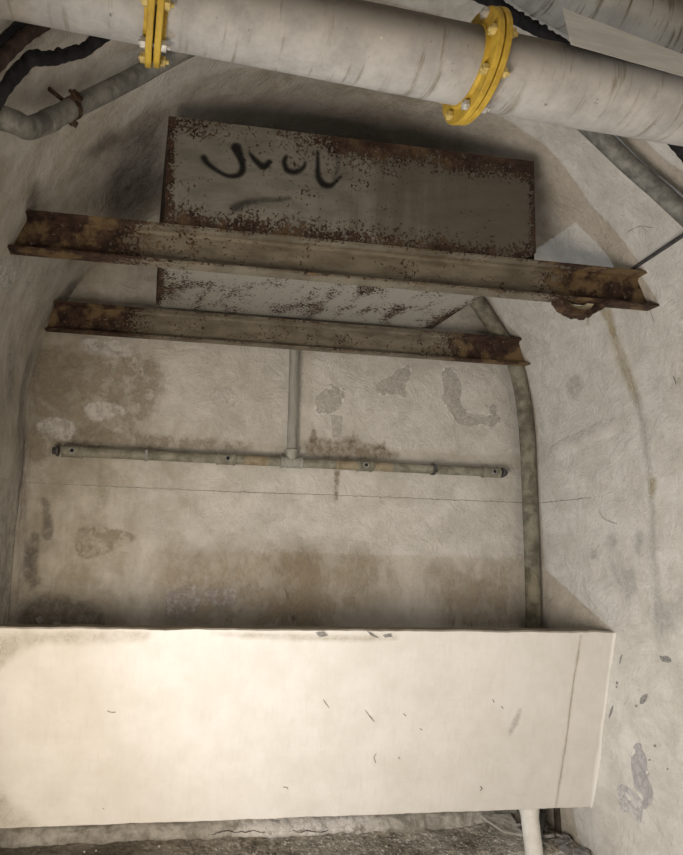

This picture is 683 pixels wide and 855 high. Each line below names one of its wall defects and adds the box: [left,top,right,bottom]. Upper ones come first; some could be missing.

rust [556,302,614,333]
peeling [617,743,653,824]